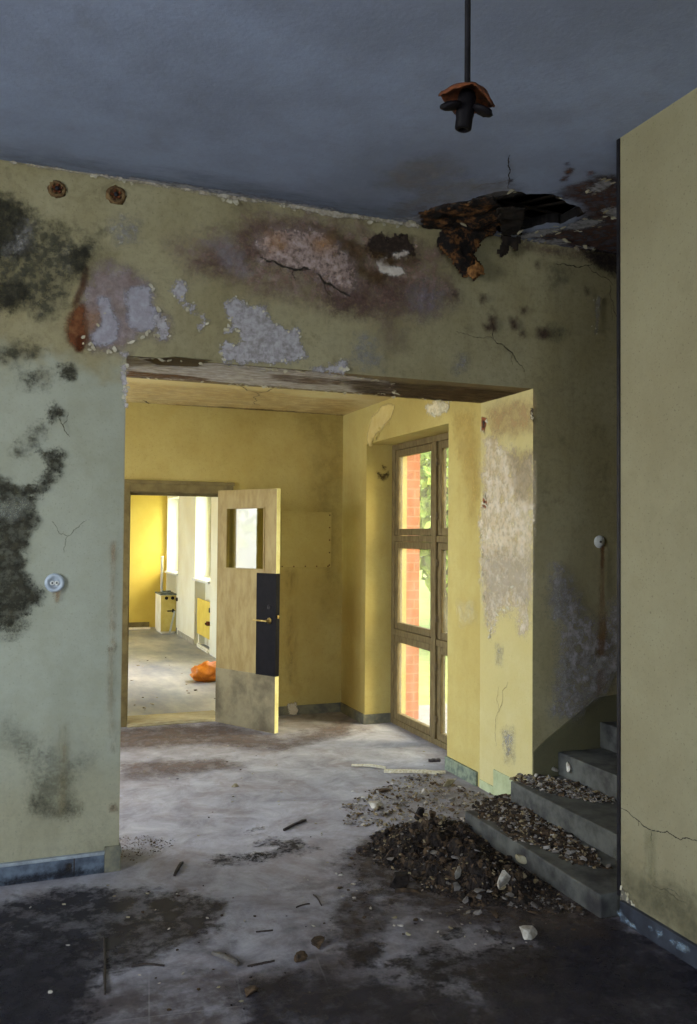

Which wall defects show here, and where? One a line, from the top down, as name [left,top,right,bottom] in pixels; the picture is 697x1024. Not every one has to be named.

leakage [0,346,37,363]
leakage [0,193,95,318]
leakage [57,363,76,381]
corrosion [66,267,88,351]
spalling [11,161,422,276]
peeling [81,262,399,446]
crack [260,257,353,298]
peeling [425,400,449,417]
leakage [0,405,66,633]
peeling [478,403,534,639]
leakage [549,563,617,718]
crack [621,808,697,841]